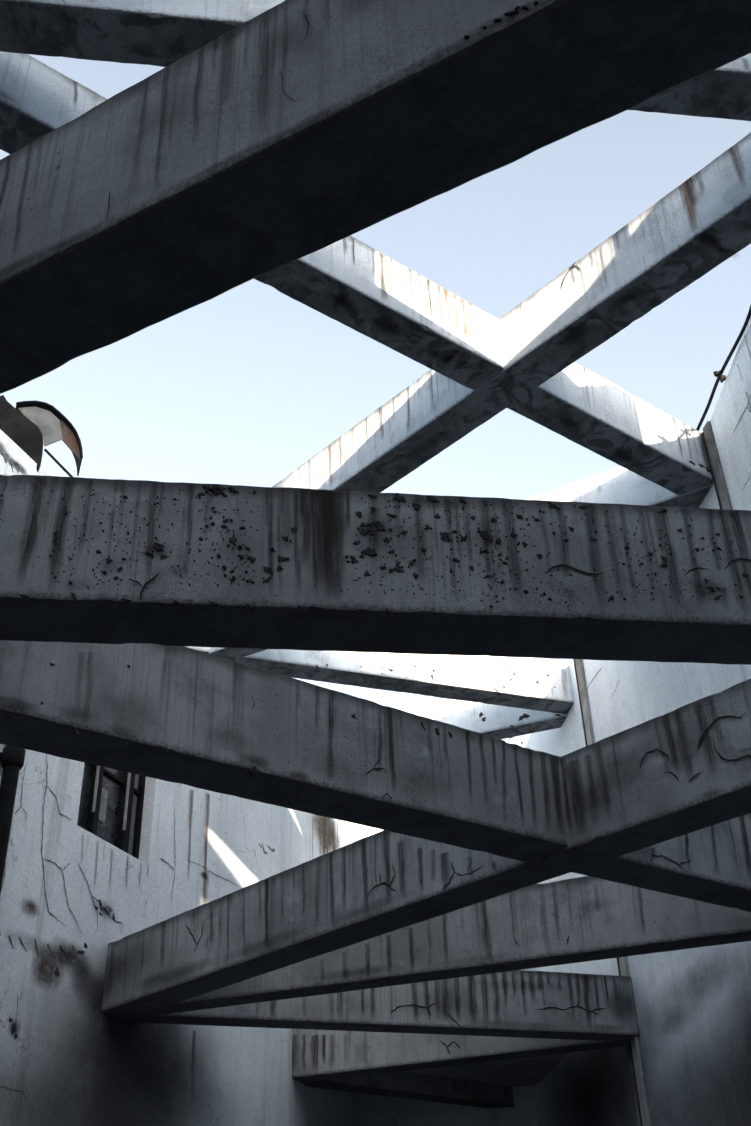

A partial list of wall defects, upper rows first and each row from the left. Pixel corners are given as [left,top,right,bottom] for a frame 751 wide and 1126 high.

spalling [482,1,538,30]
rust [682,173,697,223]
spalling [335,493,741,608]
crack [545,563,604,579]
crack [640,712,751,782]
crack [14,757,123,933]
crack [366,864,397,899]
crack [443,863,481,891]
crack [651,855,691,872]
crack [537,1001,607,1015]
crack [390,1002,462,1055]